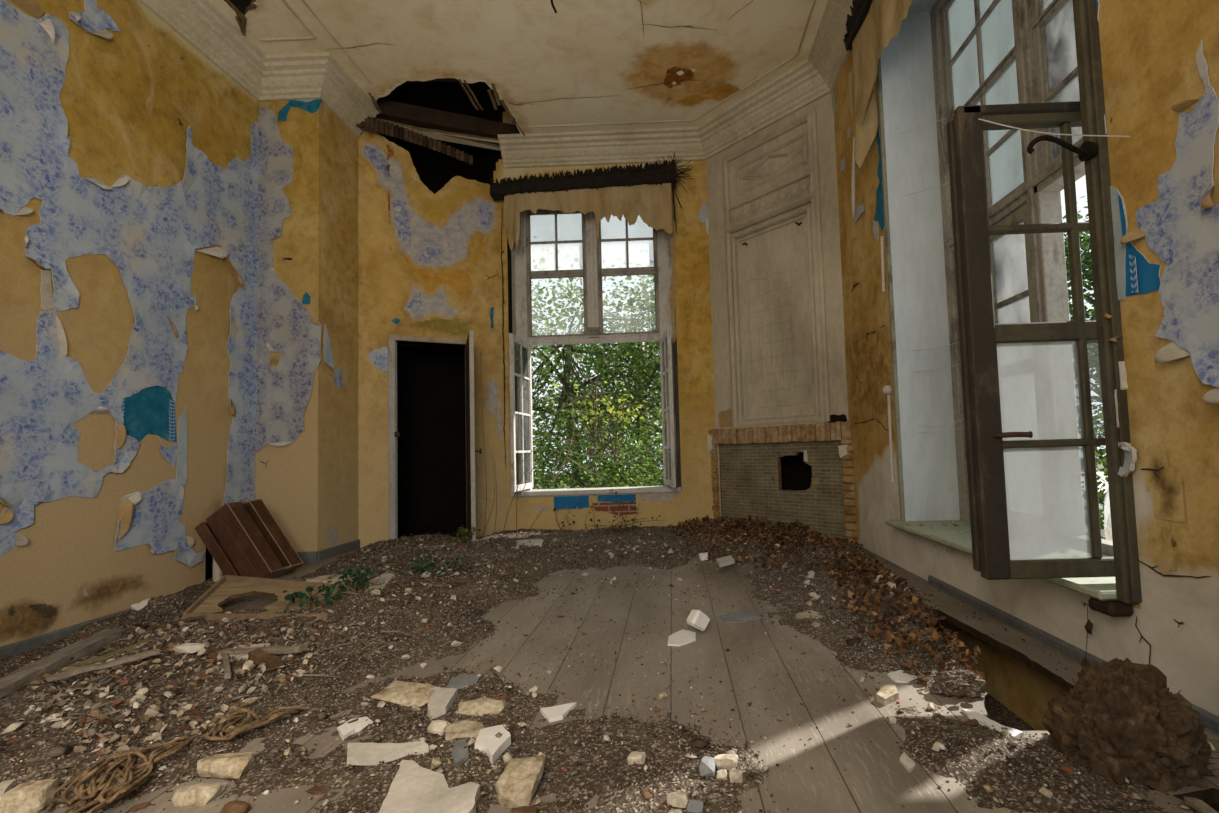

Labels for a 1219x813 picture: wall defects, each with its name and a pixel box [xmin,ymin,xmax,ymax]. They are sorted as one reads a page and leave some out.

crack [638,0,753,34]
leakage [614,36,753,112]
peeling [363,145,390,177]
peeling [392,197,445,264]
leakage [62,565,156,623]